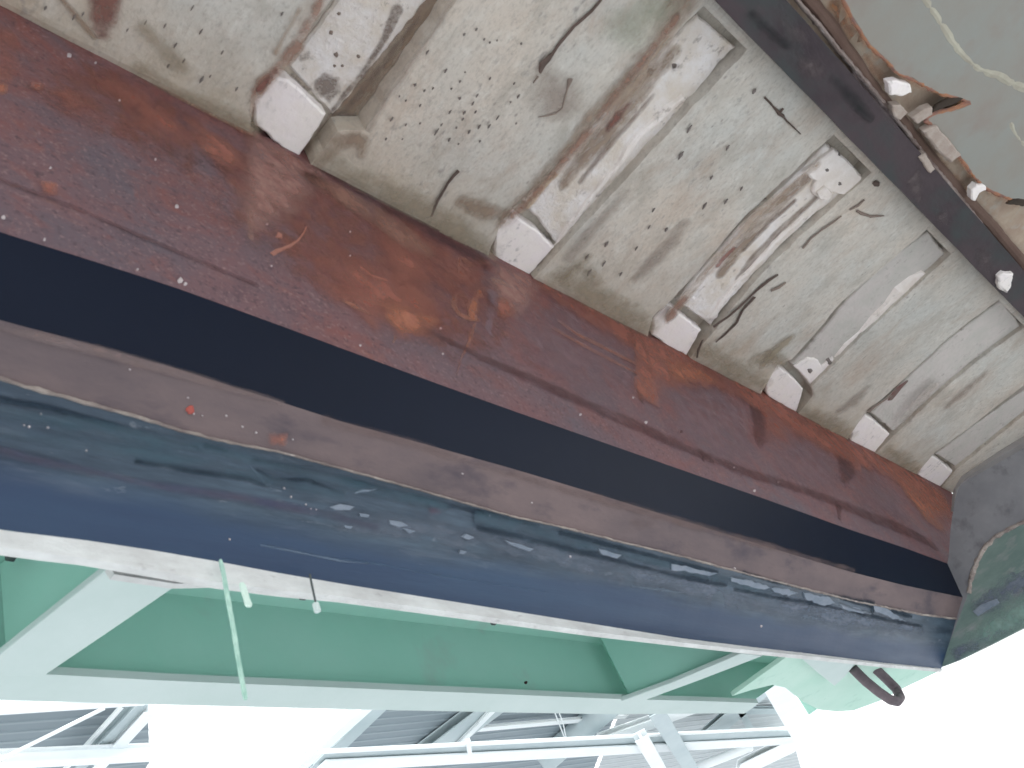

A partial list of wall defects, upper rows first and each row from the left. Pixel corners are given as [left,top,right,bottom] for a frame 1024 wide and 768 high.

corrosion [323,0,437,127]
crack [533,0,602,118]
corrosion [500,0,691,225]
corrosion [15,332,250,395]
crack [431,170,460,217]
crack [696,274,786,358]
corrosion [665,164,818,322]
corrosion [540,283,951,528]
spalling [707,216,804,319]
spalling [802,147,862,200]
crack [802,181,884,249]
peeling [0,397,922,632]